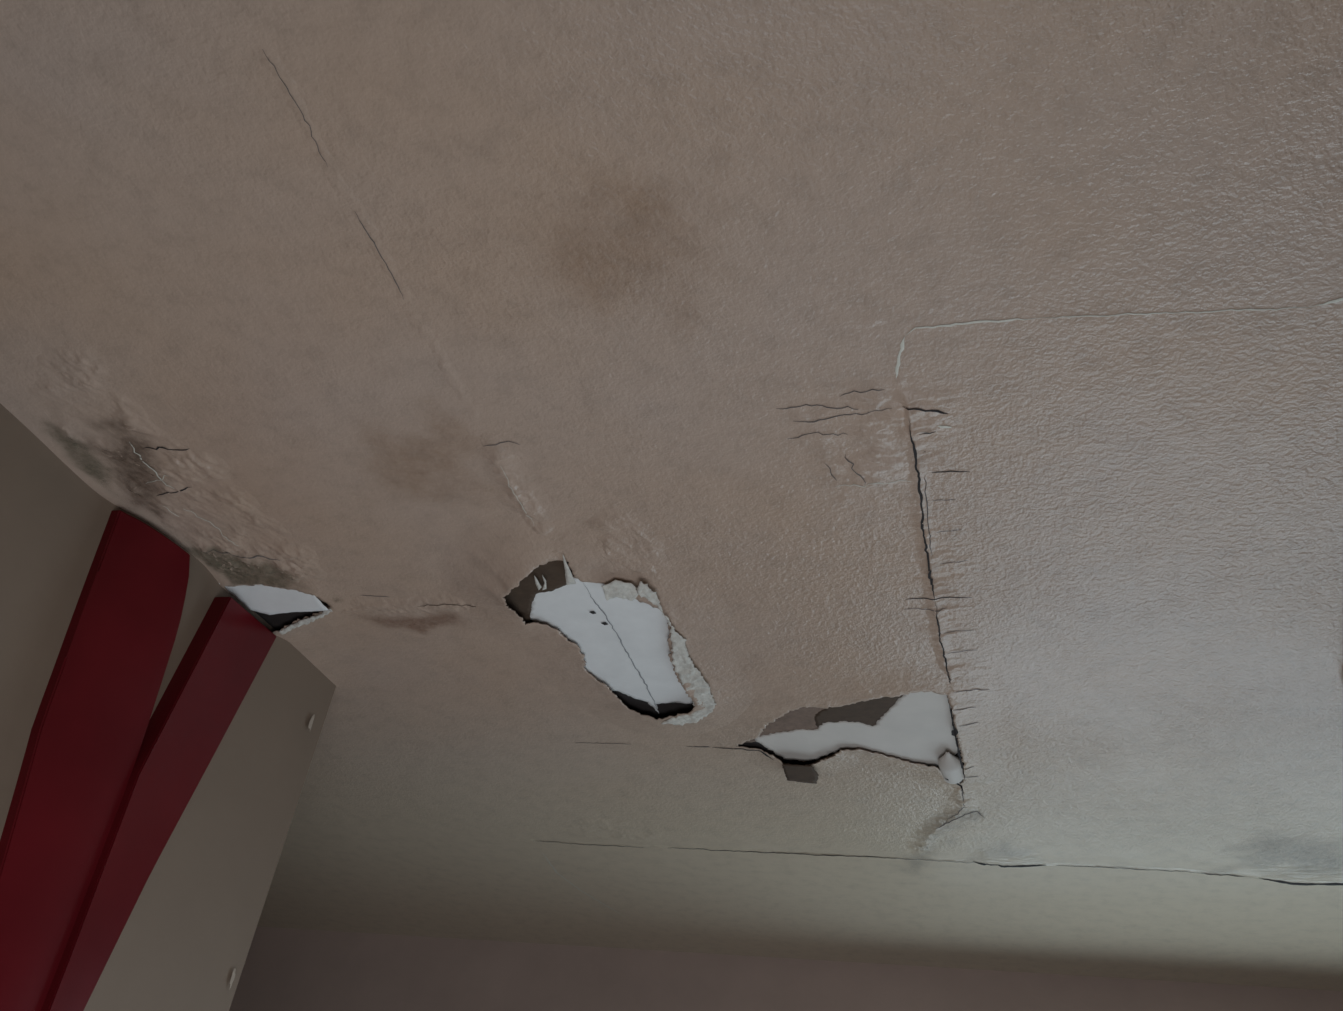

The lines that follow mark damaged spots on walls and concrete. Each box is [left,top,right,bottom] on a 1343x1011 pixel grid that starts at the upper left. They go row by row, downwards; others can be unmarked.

peeling [204,565,359,642]
peeling [437,511,1008,794]
crack [875,298,1343,683]
crack [520,780,1343,886]